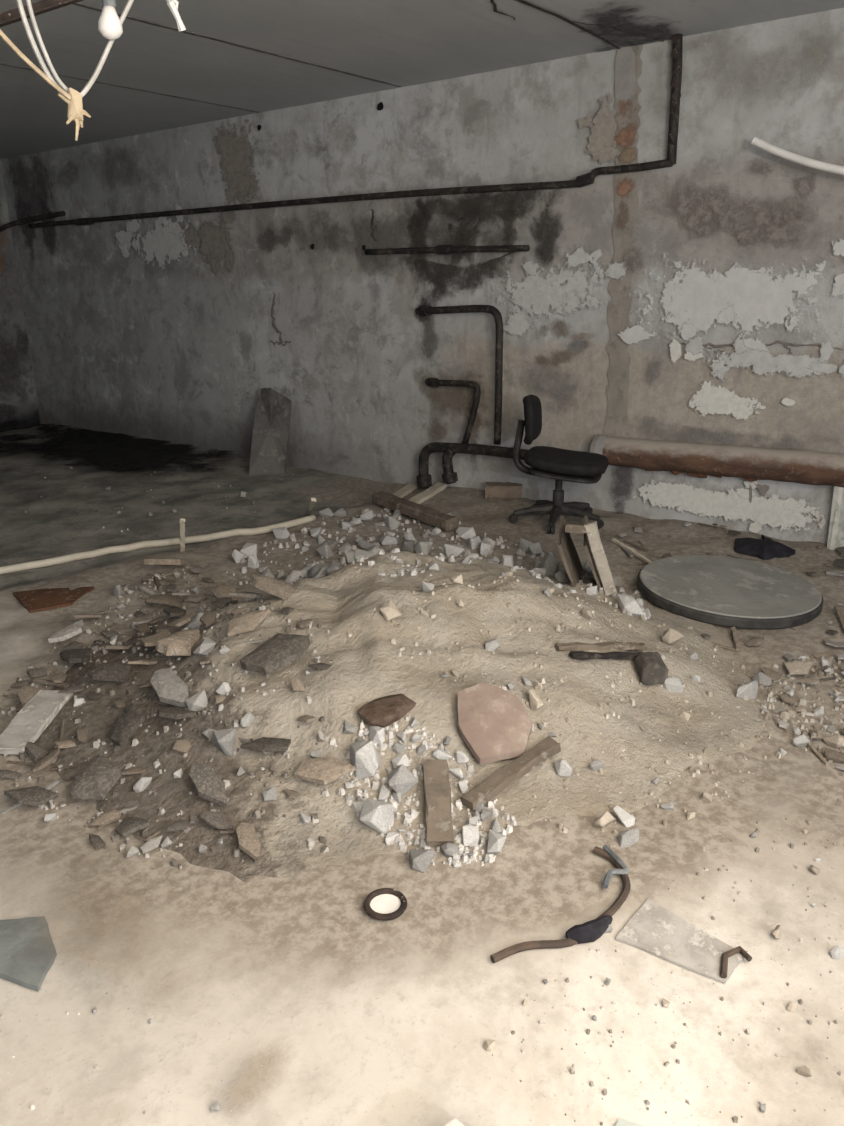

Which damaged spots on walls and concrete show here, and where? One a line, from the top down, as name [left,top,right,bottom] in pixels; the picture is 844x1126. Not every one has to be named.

crack [490,0,664,49]
leakage [10,157,78,259]
leakage [260,205,478,301]
peeling [564,245,628,279]
peeling [832,239,844,256]
leakage [424,316,437,357]
peeling [503,309,534,337]
peeling [616,324,654,344]
peeling [669,323,844,420]
leakage [0,332,230,472]
spalling [736,481,770,503]
peeling [749,522,762,533]